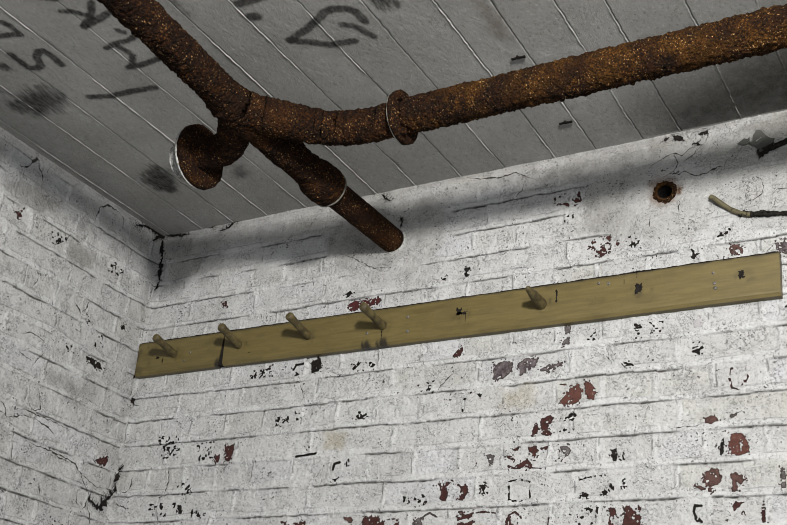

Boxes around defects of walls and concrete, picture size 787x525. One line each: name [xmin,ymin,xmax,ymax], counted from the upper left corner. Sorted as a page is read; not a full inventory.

crack [650,144,728,177]
corrosion [652,181,681,204]
peeling [491,355,566,382]
crack [0,393,133,523]
peeling [197,441,235,465]
peeling [484,379,598,525]
peeling [718,432,750,456]
peeling [343,515,399,525]
peeling [579,474,627,496]
peeling [569,492,643,525]
peeling [693,468,748,522]